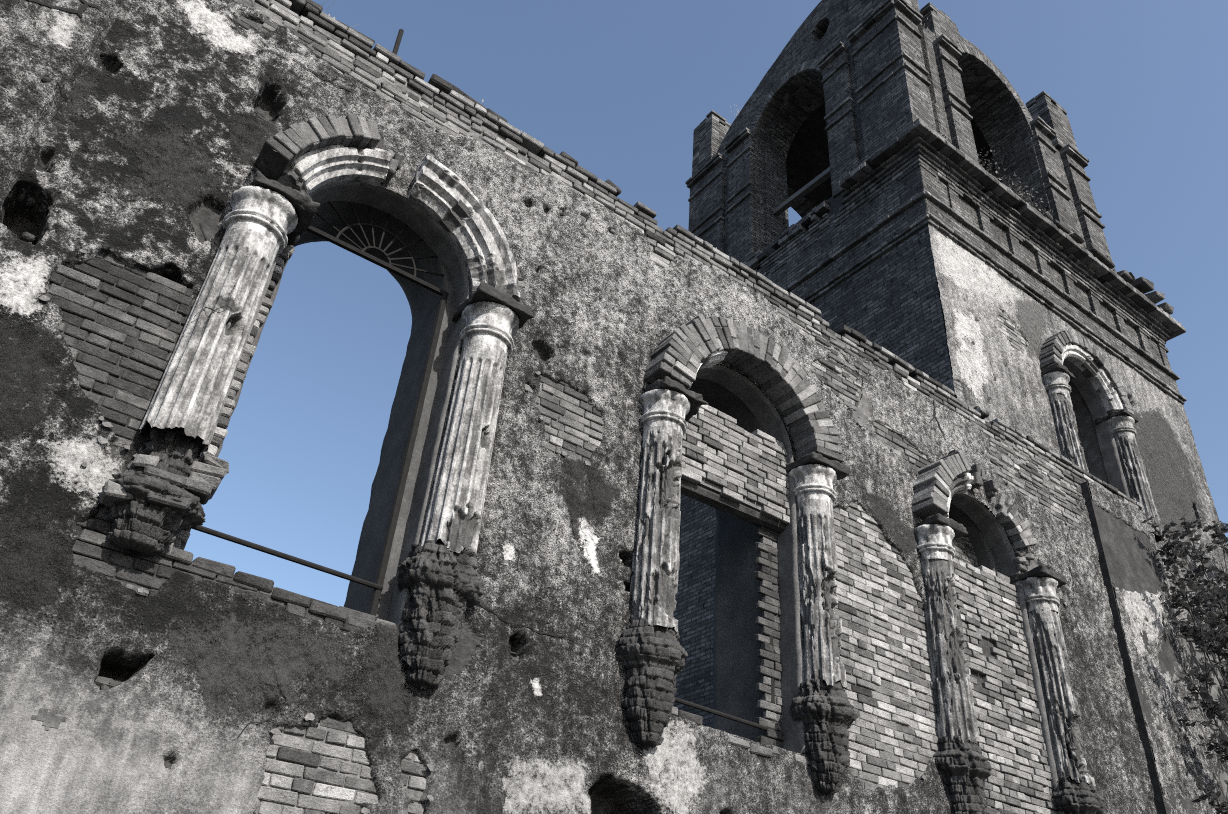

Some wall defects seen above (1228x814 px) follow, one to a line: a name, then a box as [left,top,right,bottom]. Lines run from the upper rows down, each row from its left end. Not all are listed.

hole [253,85,286,122]
hole [2,185,47,245]
peeling [524,341,604,466]
peeling [38,249,400,633]
hole [94,653,140,691]
flaking render [443,618,484,677]
peeling [253,703,378,814]
peeling [400,750,434,814]